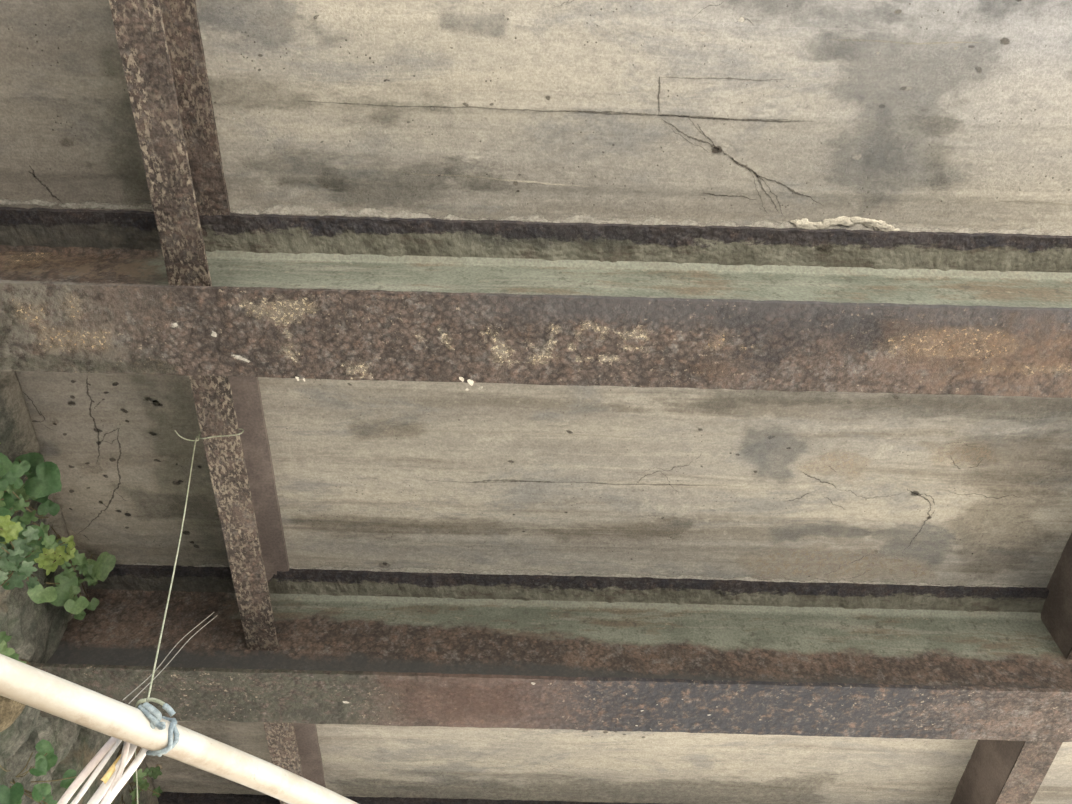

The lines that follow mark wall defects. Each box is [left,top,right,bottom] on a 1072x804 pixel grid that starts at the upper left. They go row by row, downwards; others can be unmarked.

crack [658,77,818,211]
crack [28,165,61,202]
leakage [230,205,1071,236]
crack [80,378,122,532]
crack [904,489,935,550]